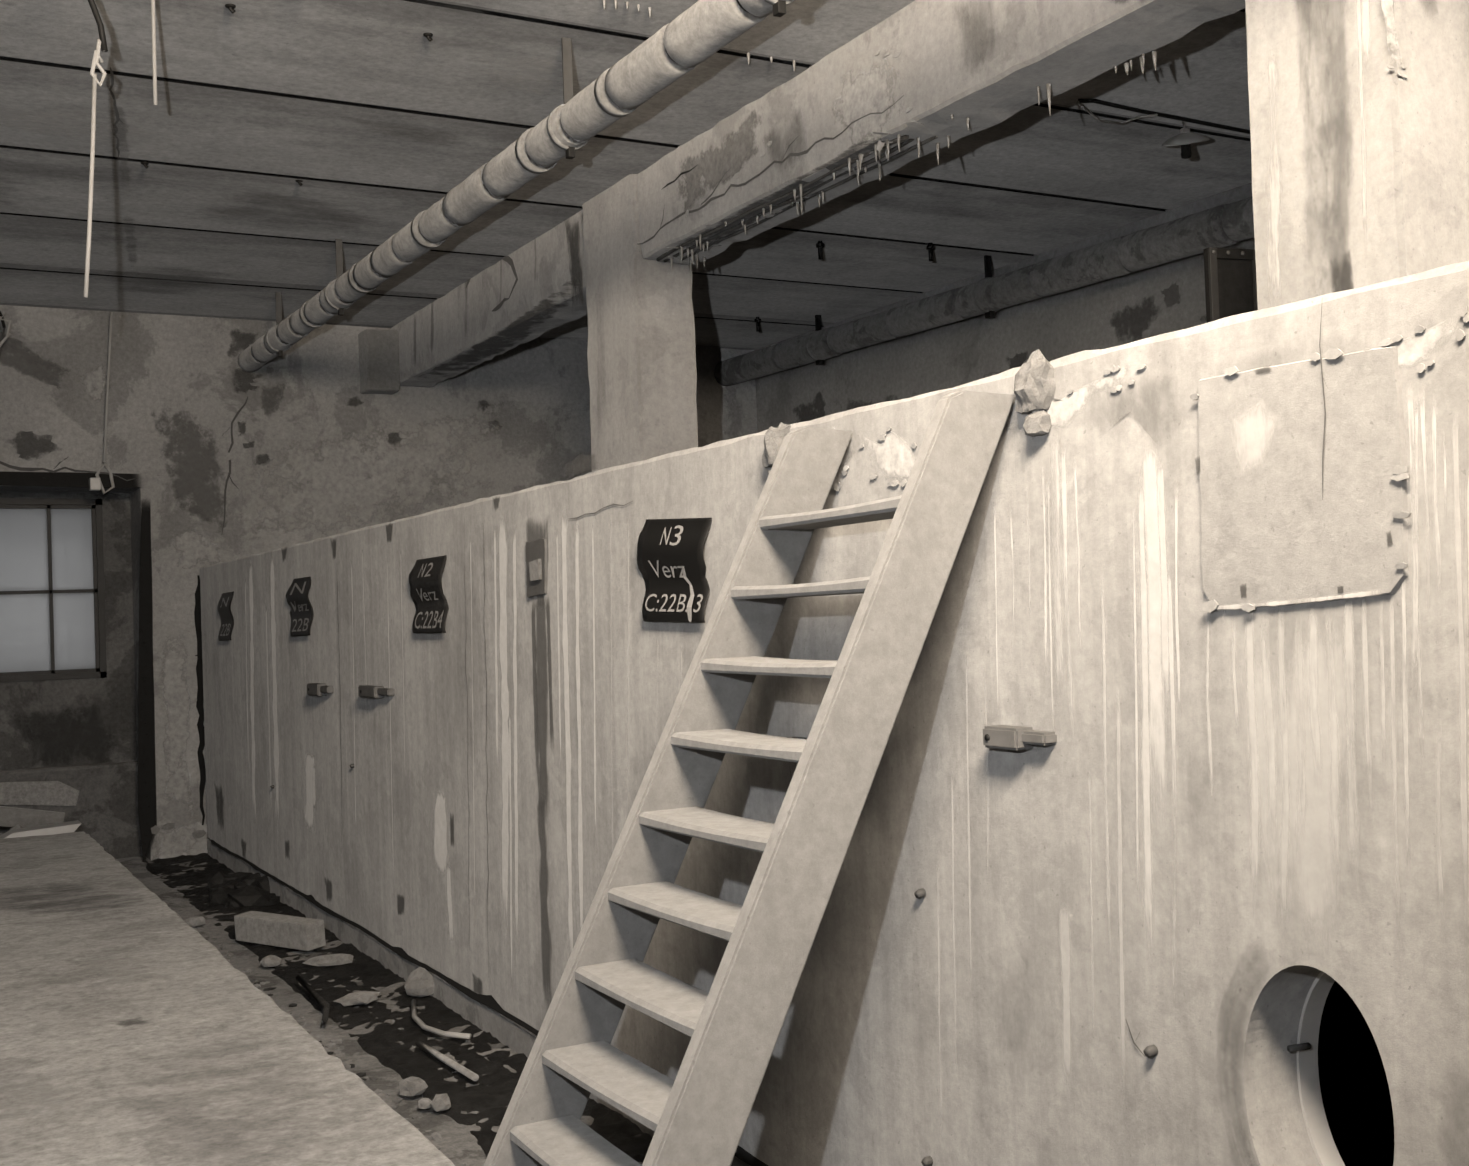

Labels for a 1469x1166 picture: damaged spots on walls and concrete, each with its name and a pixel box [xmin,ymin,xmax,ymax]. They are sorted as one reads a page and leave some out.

spalling [656,49,970,274]
damp [1333,258,1352,292]
crack [1319,307,1328,500]
damp [994,445,1080,714]
damp [1089,451,1181,1059]
damp [1232,399,1469,899]
damp [1060,912,1071,1070]